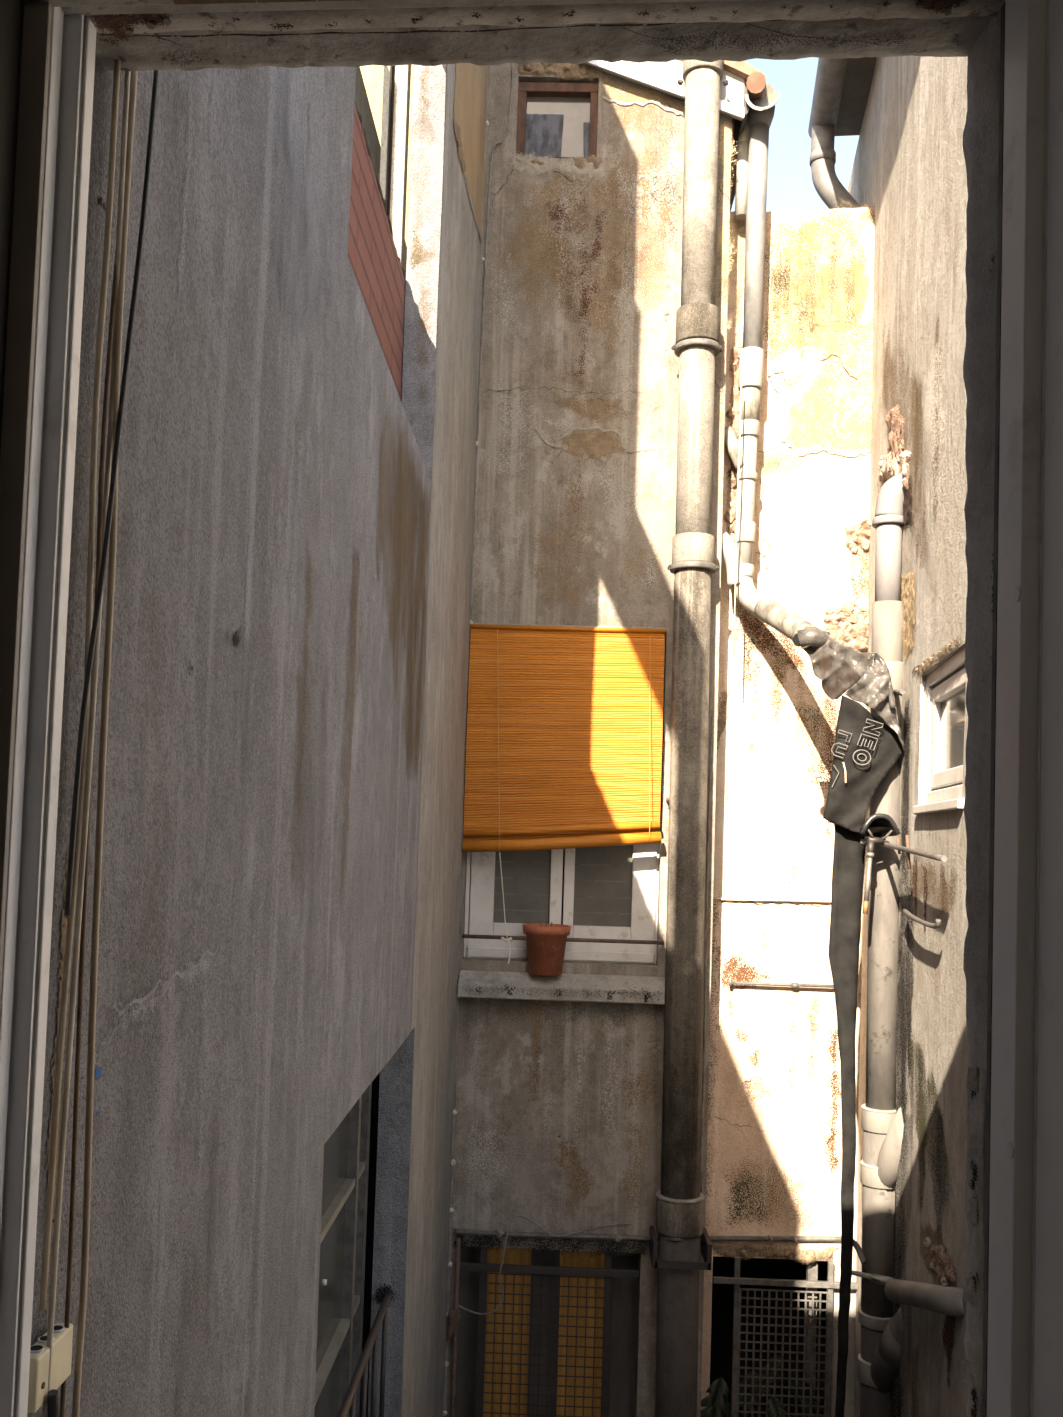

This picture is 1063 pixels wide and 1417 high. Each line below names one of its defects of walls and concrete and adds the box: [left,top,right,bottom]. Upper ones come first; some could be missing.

leakage [149,49,316,1417]
leakage [280,388,430,1052]
leakage [483,100,685,475]
leakage [522,458,669,610]
spalling [714,123,746,436]
spalling [723,456,737,533]
leakage [723,591,841,796]
leakage [765,245,828,343]
peeling [758,199,913,529]
spalling [843,518,871,601]
leakage [893,695,954,1280]
leakage [721,1157,823,1235]